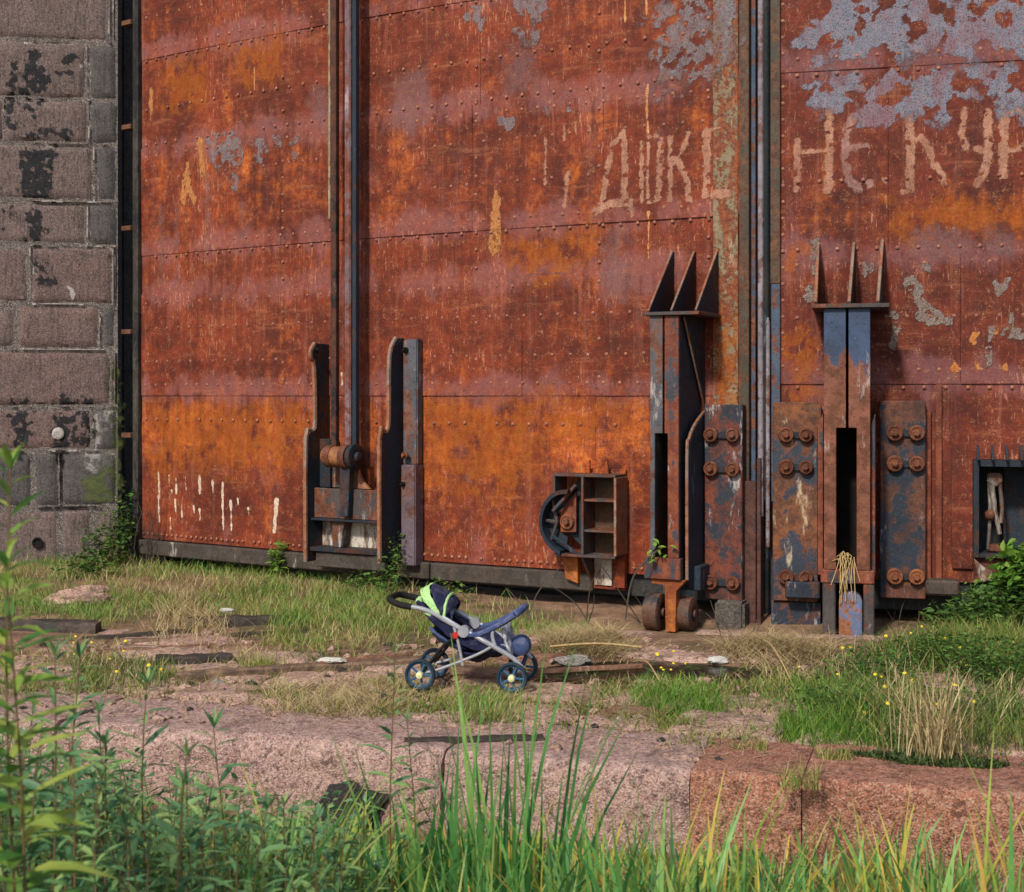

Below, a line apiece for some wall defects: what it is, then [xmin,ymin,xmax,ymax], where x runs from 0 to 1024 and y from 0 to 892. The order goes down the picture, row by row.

peeling [640,0,747,103]
peeling [791,0,1024,128]
water stain [2,40,115,307]
peeling [180,130,300,207]
peeling [886,310,902,351]
peeling [902,261,953,327]
peeling [969,312,1024,371]
peeling [992,277,1011,298]
water stain [6,398,36,461]
water stain [48,393,112,473]